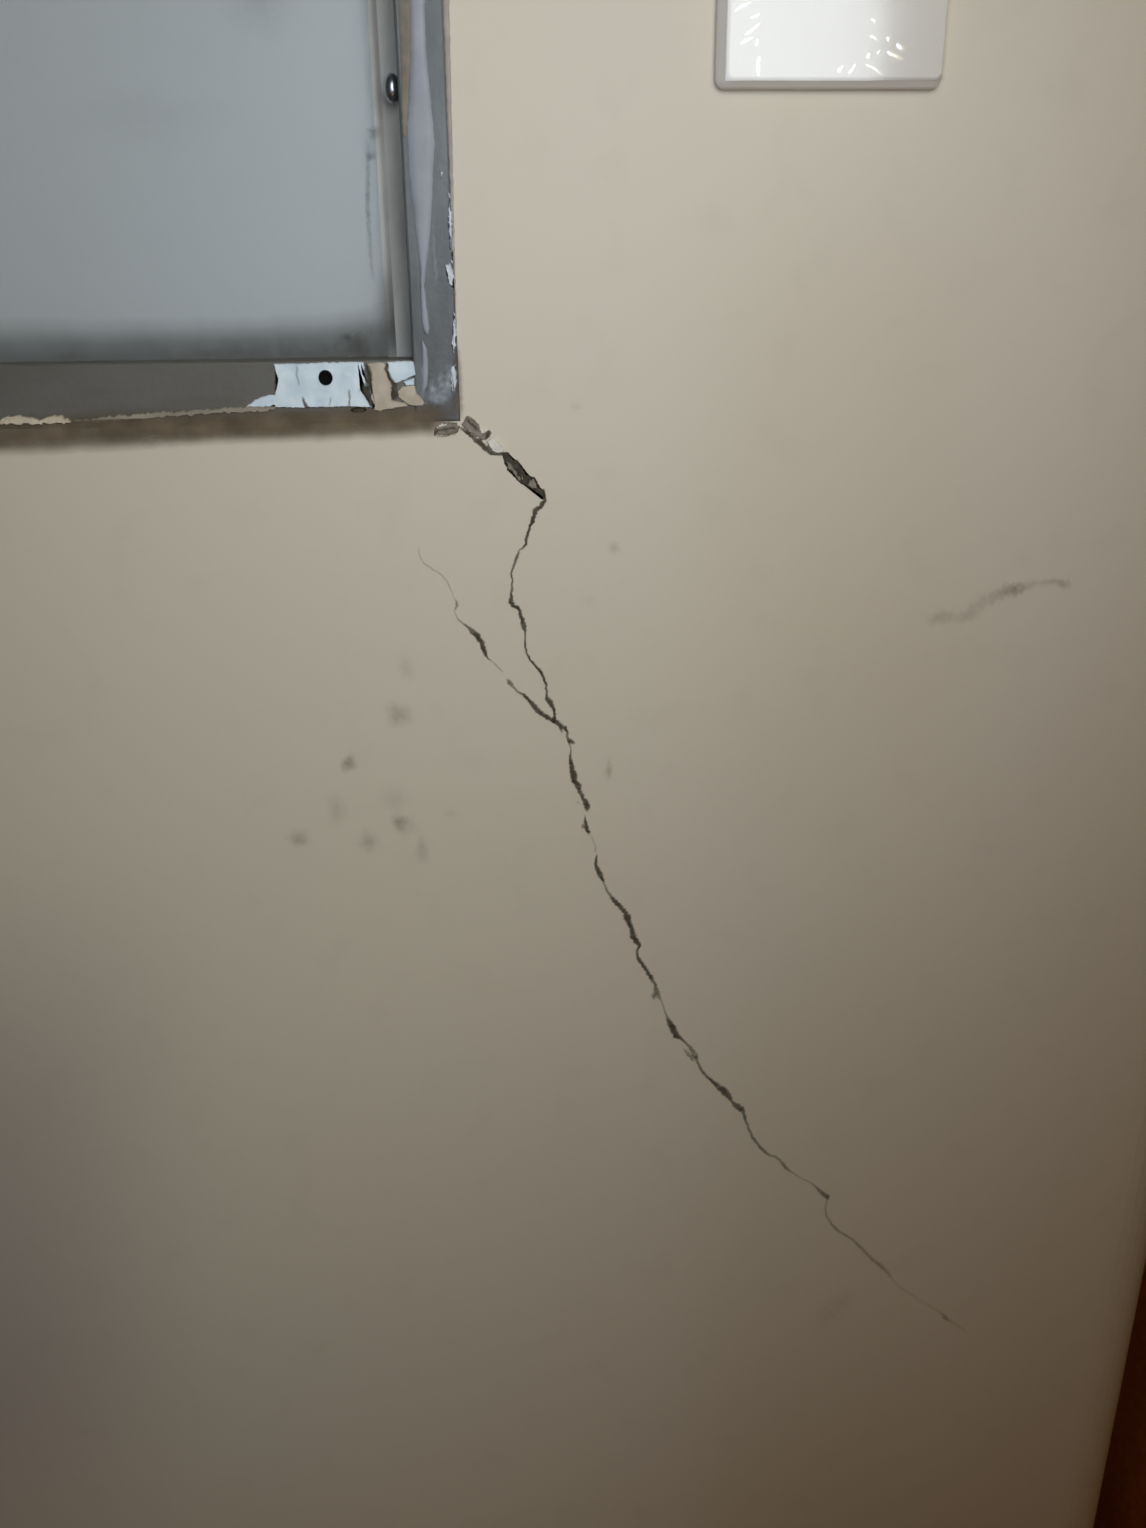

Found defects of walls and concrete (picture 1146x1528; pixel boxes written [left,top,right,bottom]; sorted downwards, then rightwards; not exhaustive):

crack [434,416,762,1149]